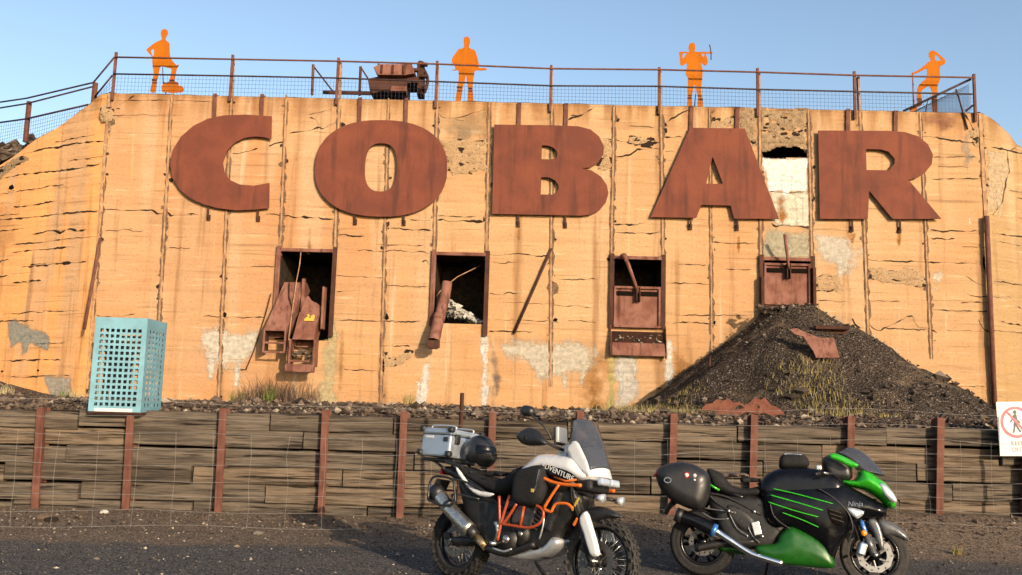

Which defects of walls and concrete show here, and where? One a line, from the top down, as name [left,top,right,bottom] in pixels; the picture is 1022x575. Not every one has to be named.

crack [113,96,209,116]
crack [0,134,198,283]
spalling [430,196,439,249]
spalling [432,105,493,261]
spalling [707,205,717,353]
spalling [756,219,764,267]
spalling [708,107,816,258]
water stain [762,158,854,277]
crack [817,113,1022,333]